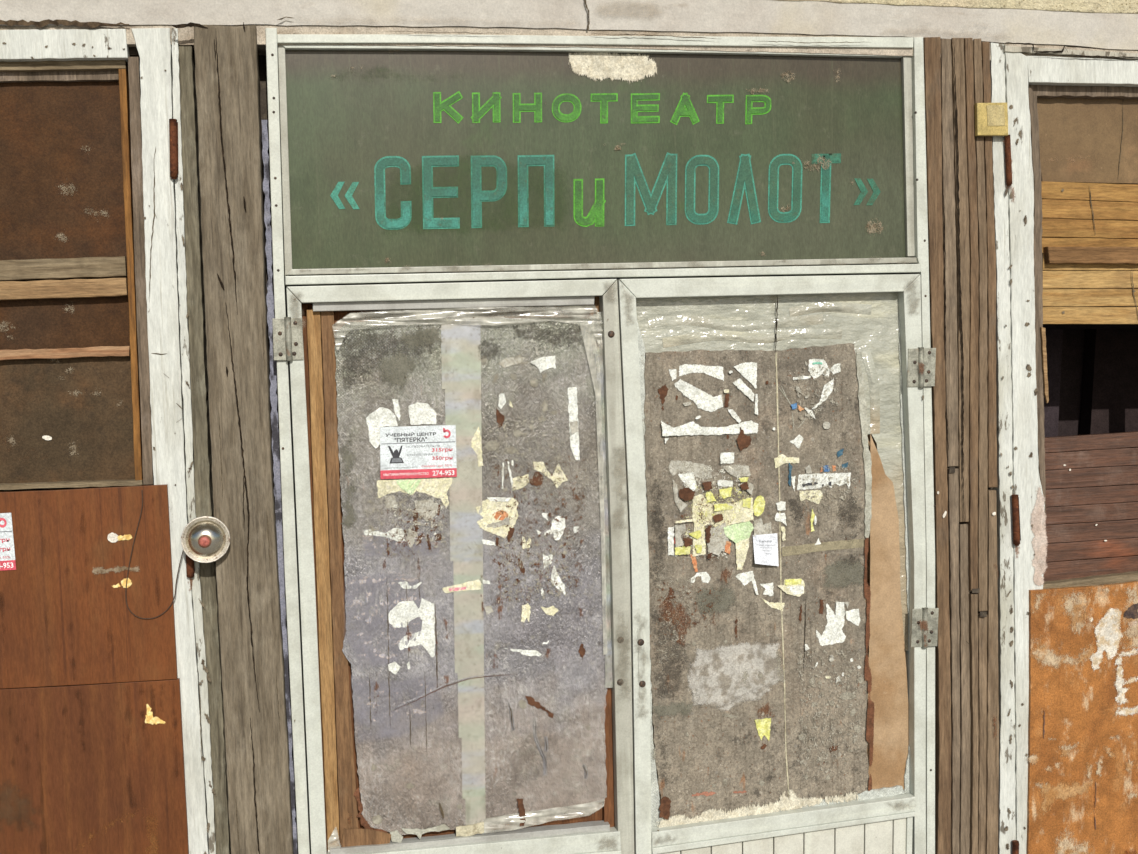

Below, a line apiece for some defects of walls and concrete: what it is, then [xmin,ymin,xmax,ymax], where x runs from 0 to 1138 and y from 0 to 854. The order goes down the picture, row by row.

crack [386,28,498,36]
crack [584,0,715,39]
crack [759,38,860,46]
peeling [1122,588,1138,649]